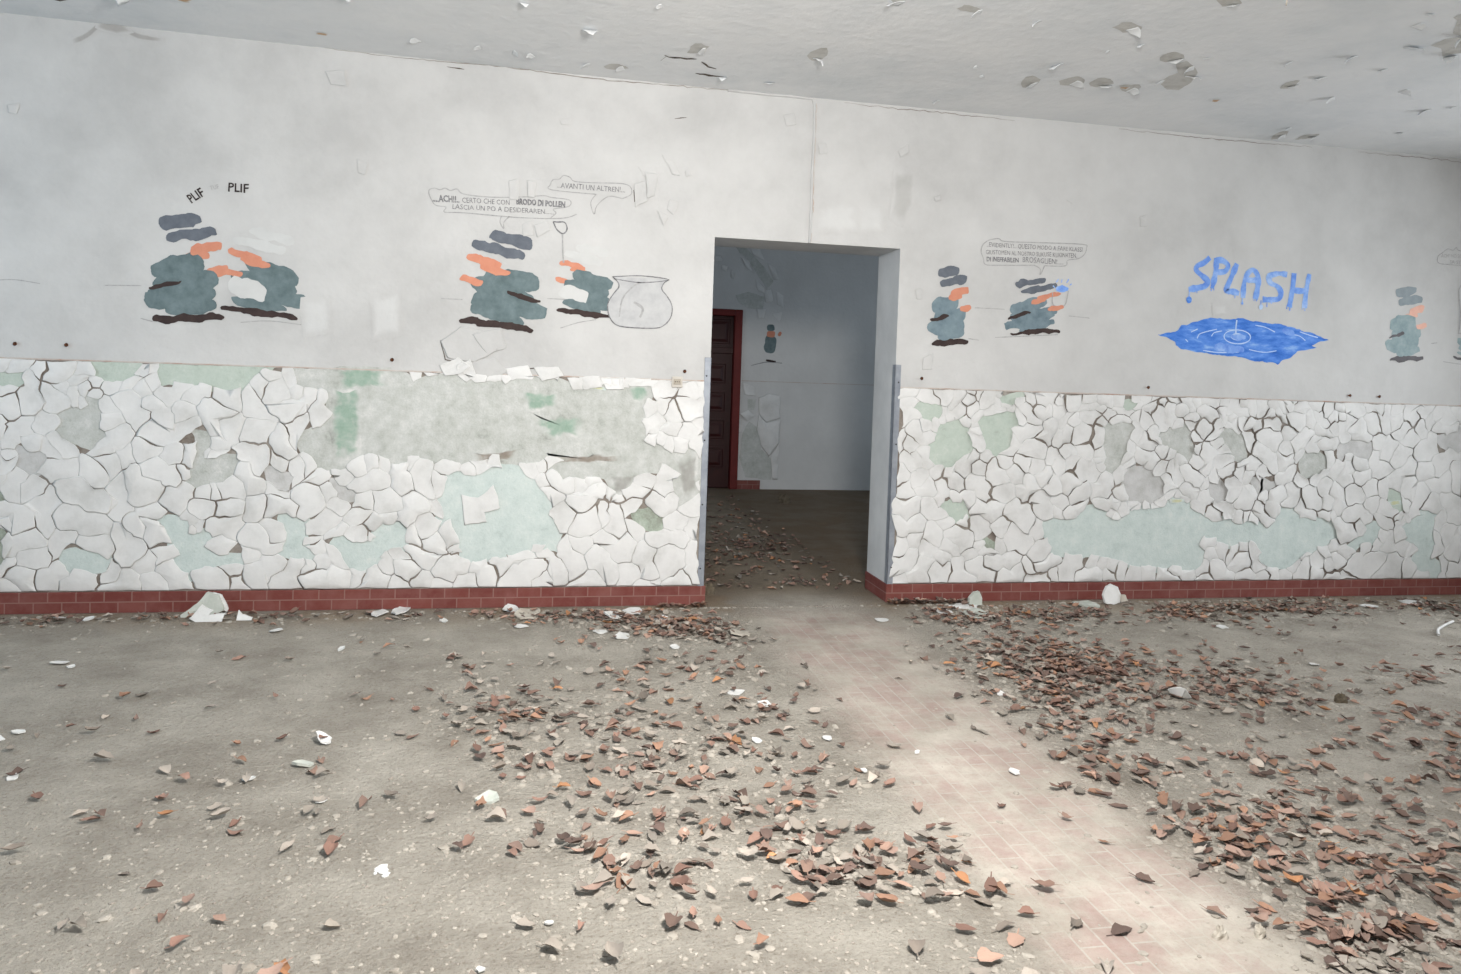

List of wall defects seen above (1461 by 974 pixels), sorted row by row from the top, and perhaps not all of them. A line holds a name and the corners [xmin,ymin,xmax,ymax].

peeling [807,48,828,67]
peeling [1021,52,1201,96]
peeling [1112,22,1146,48]
peeling [1280,80,1300,89]
peeling [1431,14,1461,63]
peeling [1271,131,1319,140]
peeling [739,383,781,480]
peeling [0,358,704,592]
peeling [898,388,1461,582]